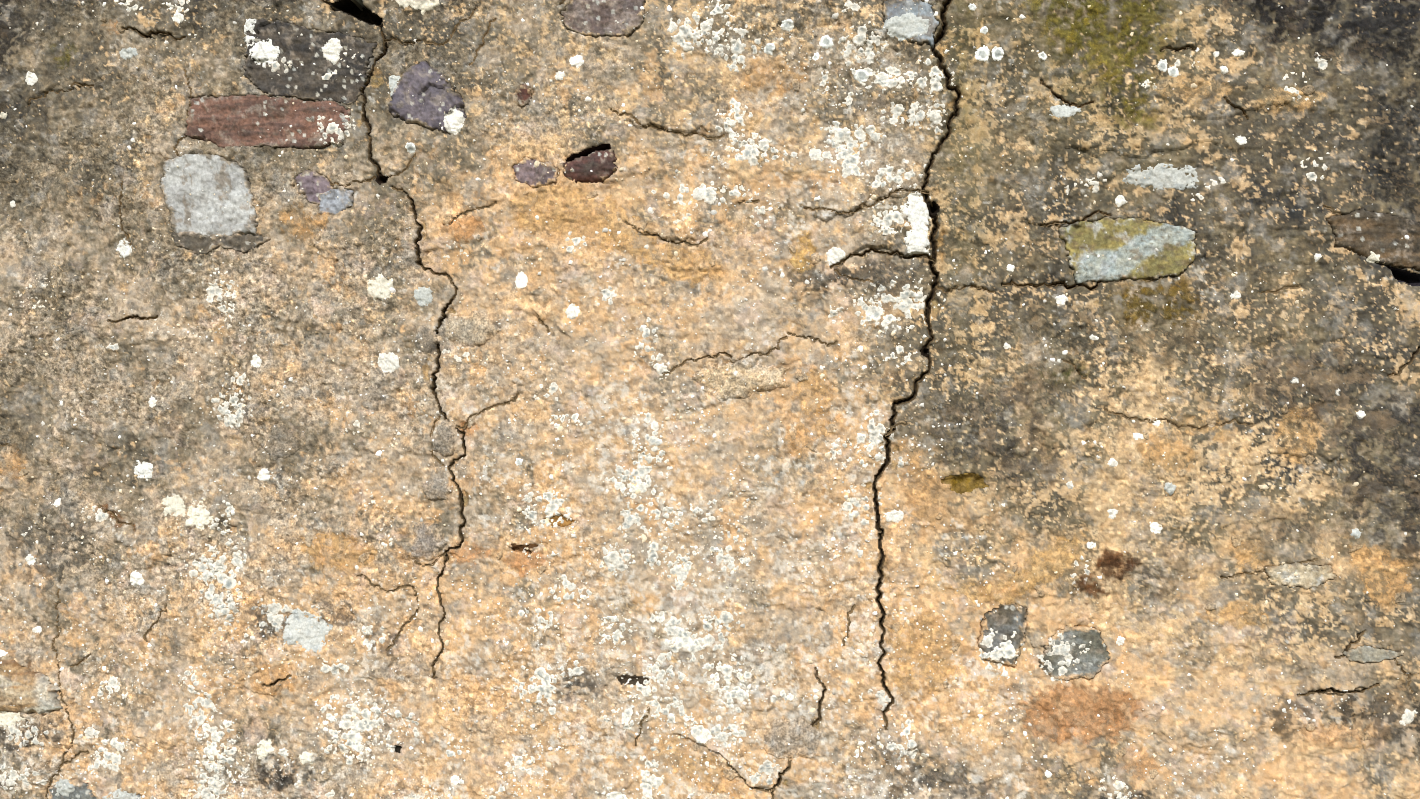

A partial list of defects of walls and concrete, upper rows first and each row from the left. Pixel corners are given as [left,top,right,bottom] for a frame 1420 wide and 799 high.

crack [330,7,519,680]
crack [803,0,1160,730]
crack [726,759,792,799]